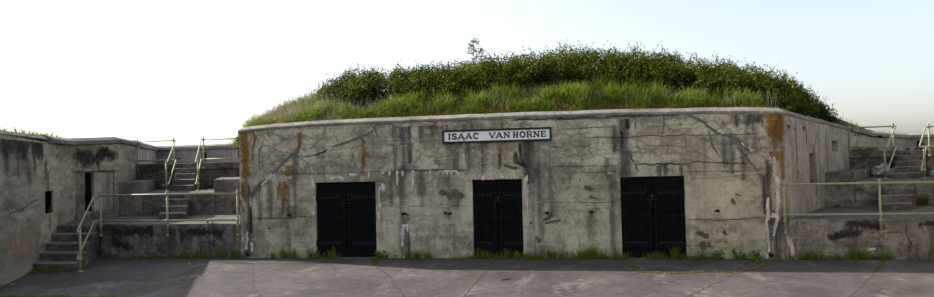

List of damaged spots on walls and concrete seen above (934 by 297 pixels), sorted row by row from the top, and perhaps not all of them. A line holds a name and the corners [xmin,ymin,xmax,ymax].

water stain [0,139,48,181]
corrosion [227,131,270,212]
corrosion [276,132,302,213]
corrosion [352,138,368,170]
crack [249,123,529,222]
crack [512,114,767,179]
corrosion [759,114,786,179]
water stain [400,220,410,254]